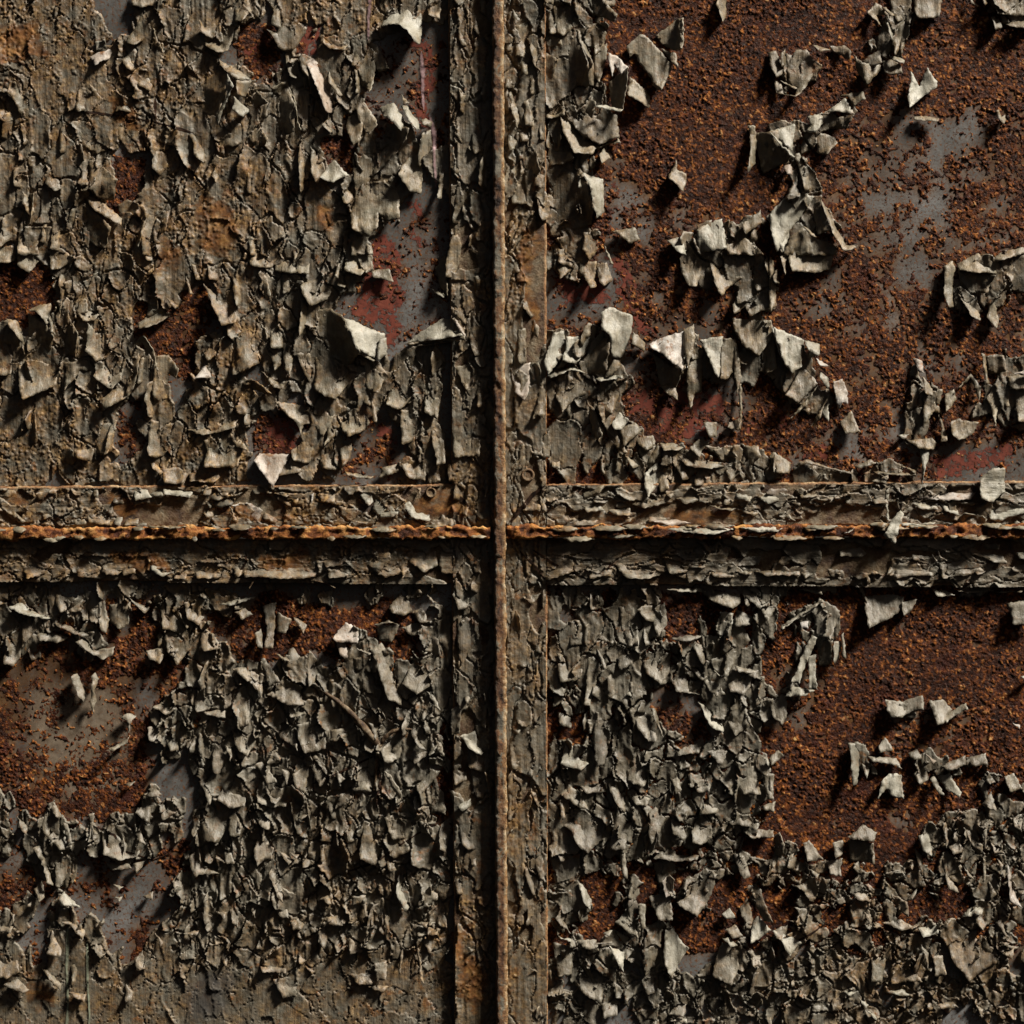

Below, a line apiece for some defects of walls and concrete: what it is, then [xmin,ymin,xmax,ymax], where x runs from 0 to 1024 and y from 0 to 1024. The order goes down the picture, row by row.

corrosion [340,209,450,350]
corrosion [516,0,1024,485]
corrosion [216,505,252,519]
peeling [0,0,497,1024]
corrosion [664,510,733,526]
peeling [503,0,1024,1024]
corrosion [0,550,424,966]
corrosion [430,718,454,835]
corrosion [547,584,1024,959]